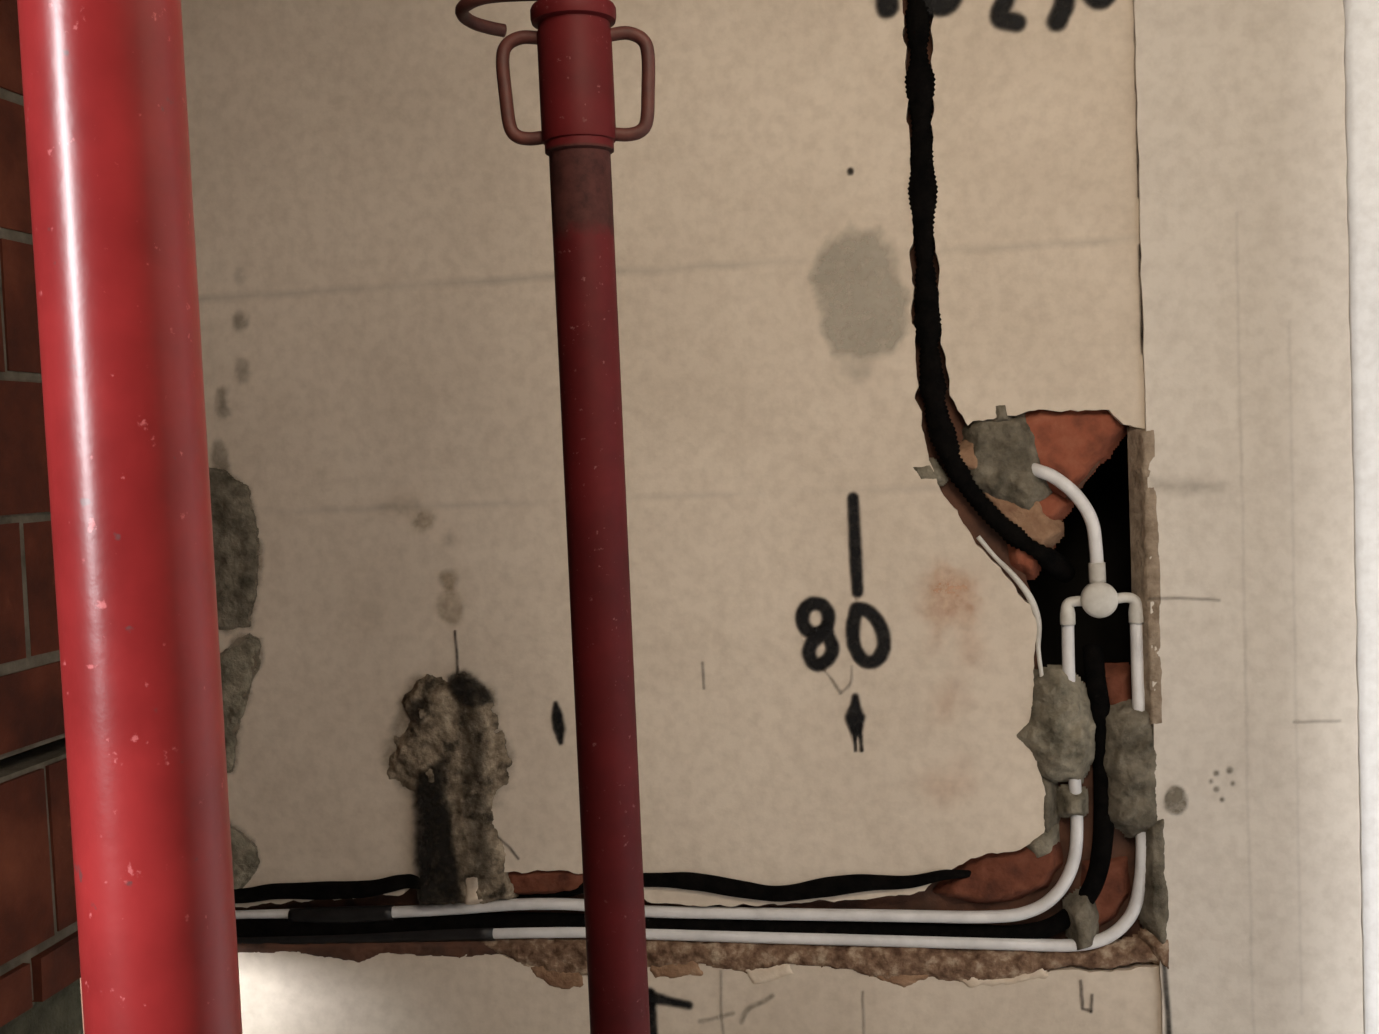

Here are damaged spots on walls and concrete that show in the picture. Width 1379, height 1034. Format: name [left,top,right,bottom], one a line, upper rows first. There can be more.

flaking render [1007,544,1041,580]
spalling [1025,410,1162,725]
peeling [464,877,483,905]
flaking render [508,870,583,895]
flaking render [933,824,1063,903]
spalling [237,938,588,989]
spalling [646,856,1171,1034]